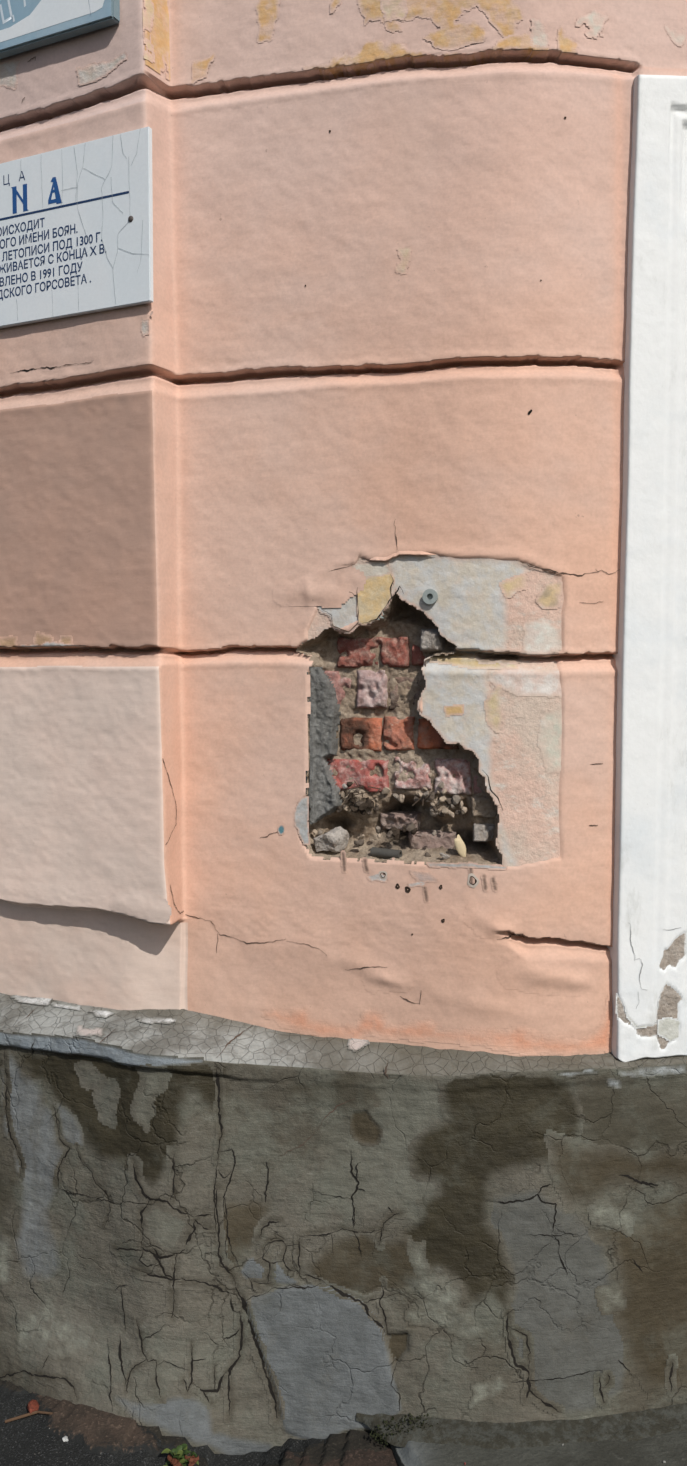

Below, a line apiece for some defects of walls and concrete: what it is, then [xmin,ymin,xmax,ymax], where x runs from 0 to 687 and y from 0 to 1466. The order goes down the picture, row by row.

peeling [255,0,280,43]
peeling [302,0,609,80]
flaking render [294,551,564,889]
peeling [558,933,687,1089]
crack [0,1009,407,1429]
water stain [306,1069,687,1399]
crack [495,1184,573,1275]
crack [622,1175,658,1193]
water stain [469,1373,509,1410]
crack [501,1307,678,1418]